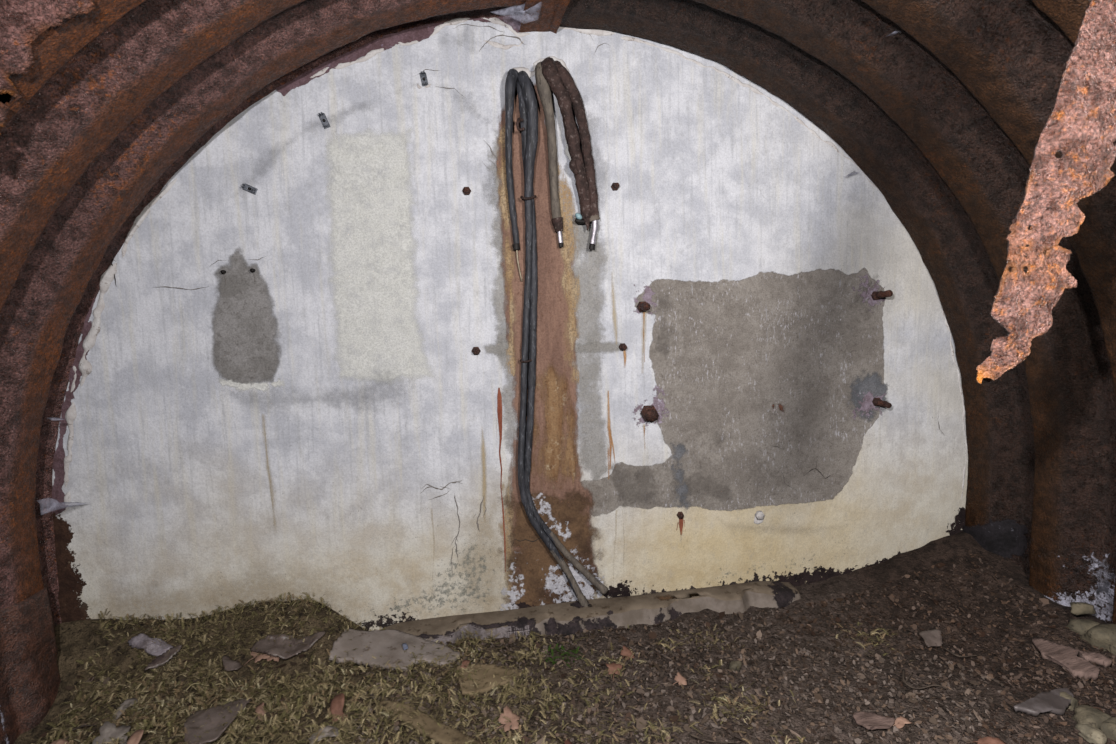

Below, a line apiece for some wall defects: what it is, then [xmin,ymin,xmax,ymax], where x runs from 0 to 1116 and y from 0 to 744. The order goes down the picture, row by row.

flaking render [212,250,280,384]
corrosion [496,82,609,611]
flaking render [571,219,887,516]
corrosion [976,0,1116,384]